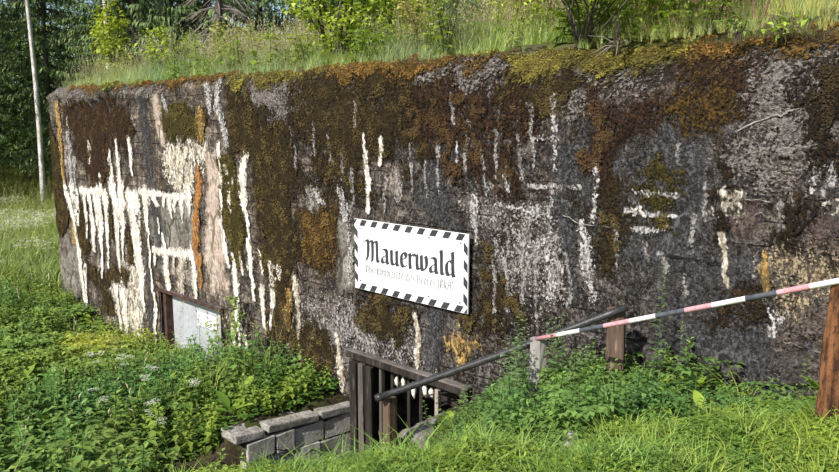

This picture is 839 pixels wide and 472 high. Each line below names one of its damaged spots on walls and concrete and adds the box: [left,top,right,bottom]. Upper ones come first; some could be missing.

damp [63,95,199,340]
rust [191,164,203,290]
efflorescence [204,75,281,350]
efflorescence [292,275,301,339]
efflorescence [362,133,383,214]
damp [405,128,469,232]
efflorescence [468,194,479,245]
damp [494,93,604,305]
damp [607,90,819,402]
damp [801,155,839,221]